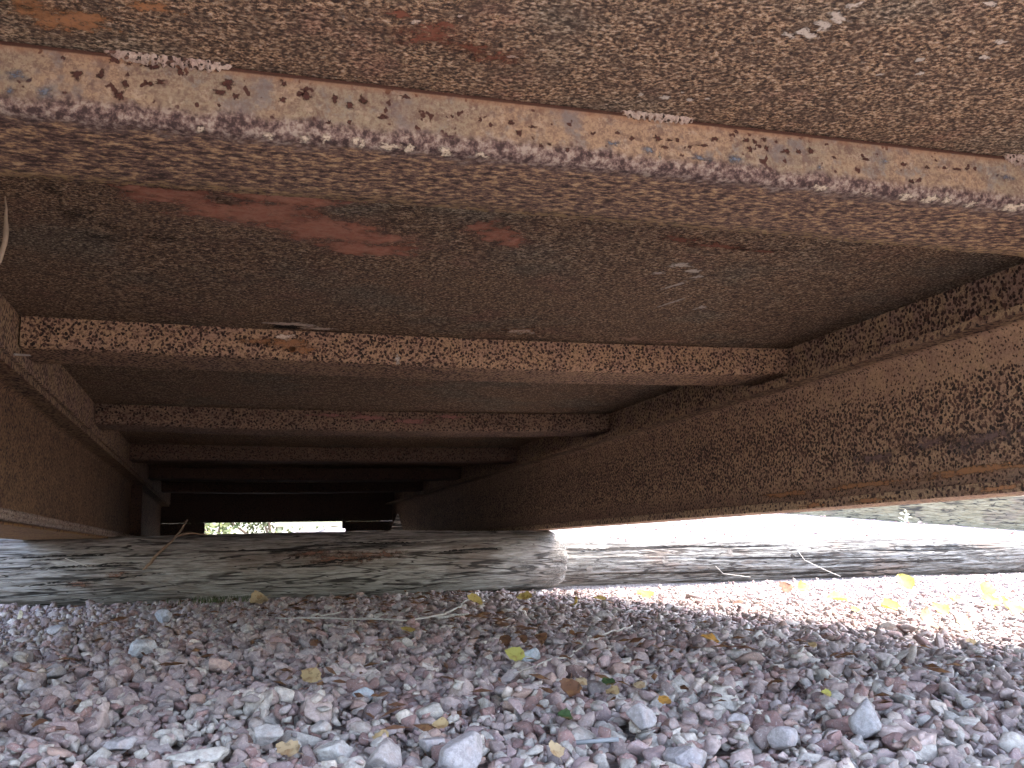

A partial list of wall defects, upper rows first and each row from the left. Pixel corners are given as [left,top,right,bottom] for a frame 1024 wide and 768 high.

corrosion [7,0,123,33]
corrosion [96,56,165,87]
corrosion [213,79,240,107]
corrosion [332,94,368,125]
corrosion [653,135,718,149]
corrosion [734,130,814,154]